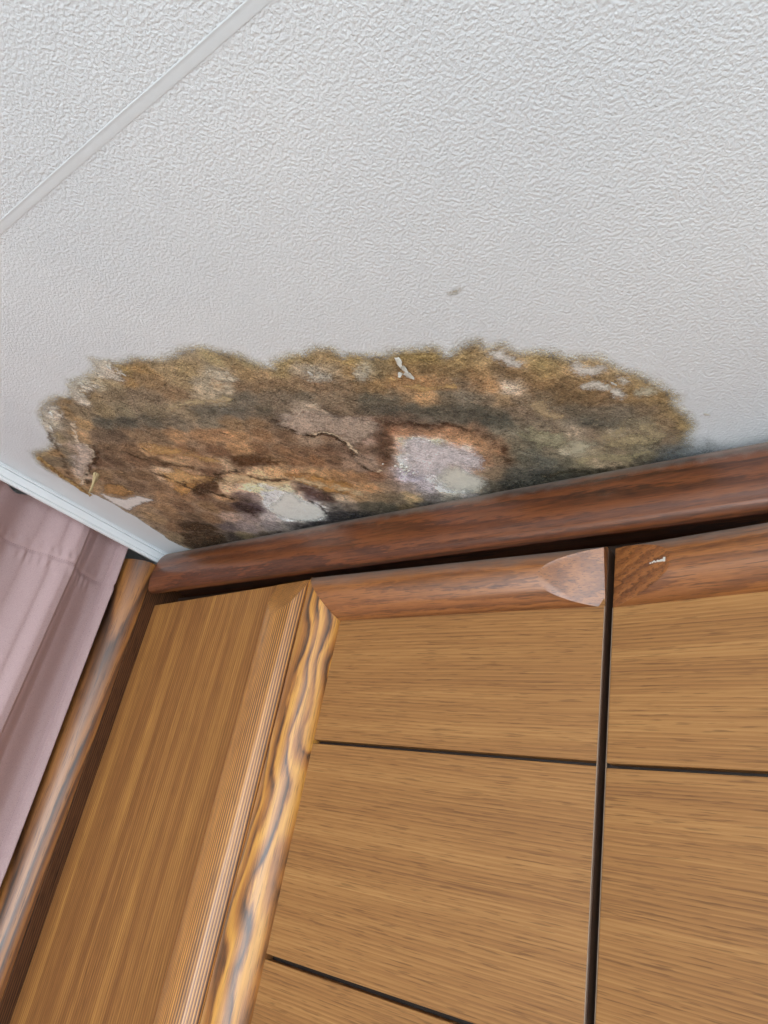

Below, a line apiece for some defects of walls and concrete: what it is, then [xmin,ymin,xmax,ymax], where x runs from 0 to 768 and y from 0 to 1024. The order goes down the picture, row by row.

water stain [34,340,714,549]